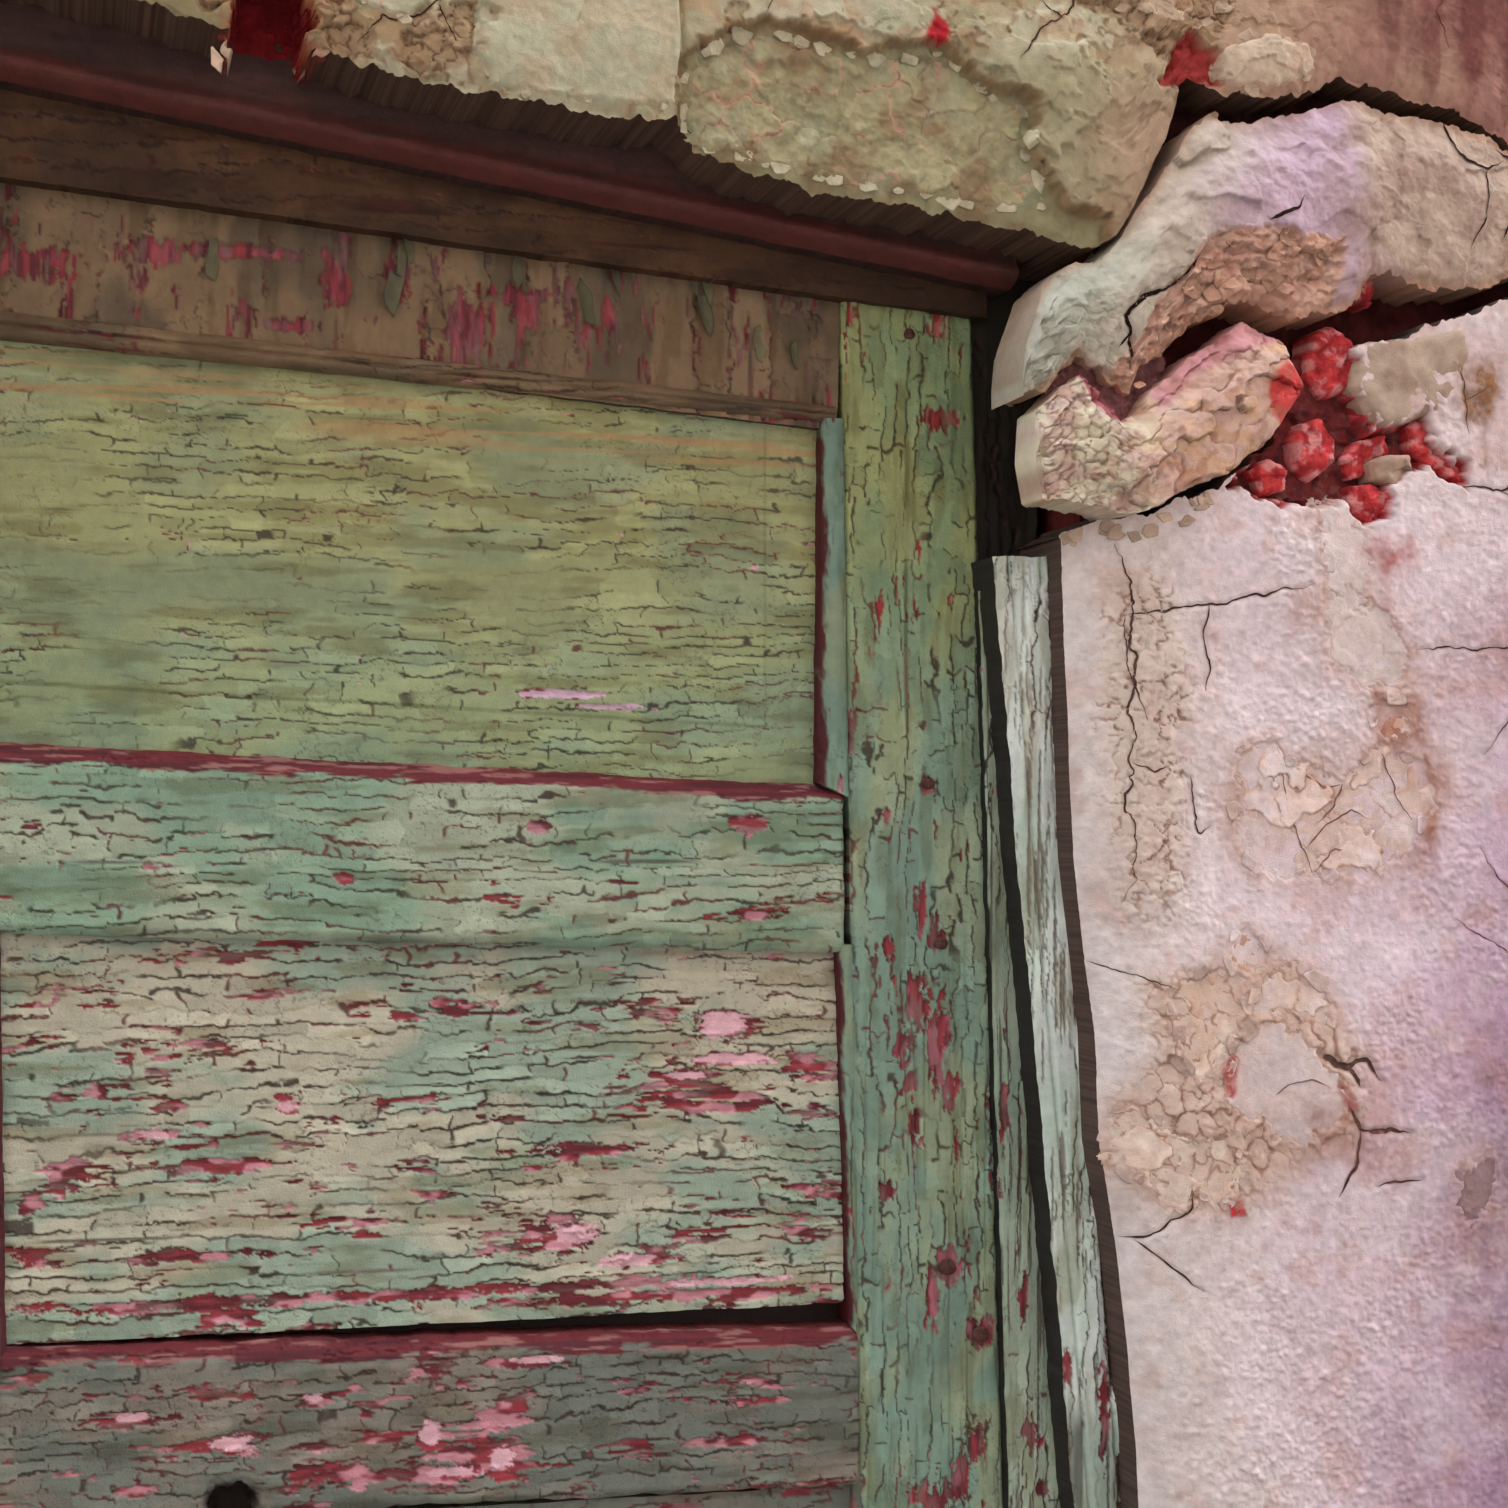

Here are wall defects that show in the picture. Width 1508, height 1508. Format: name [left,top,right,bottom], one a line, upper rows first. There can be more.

peeling [1059,491,1214,547]
crack [1114,545,1315,899]
peeling [1226,495,1439,885]
crack [1418,645,1508,653]
crack [1087,961,1177,990]
crack [1457,919,1508,953]
spalling [1165,930,1368,1150]
peeling [1096,1101,1254,1214]
crack [1319,1052,1421,1197]
crack [1119,1190,1203,1291]